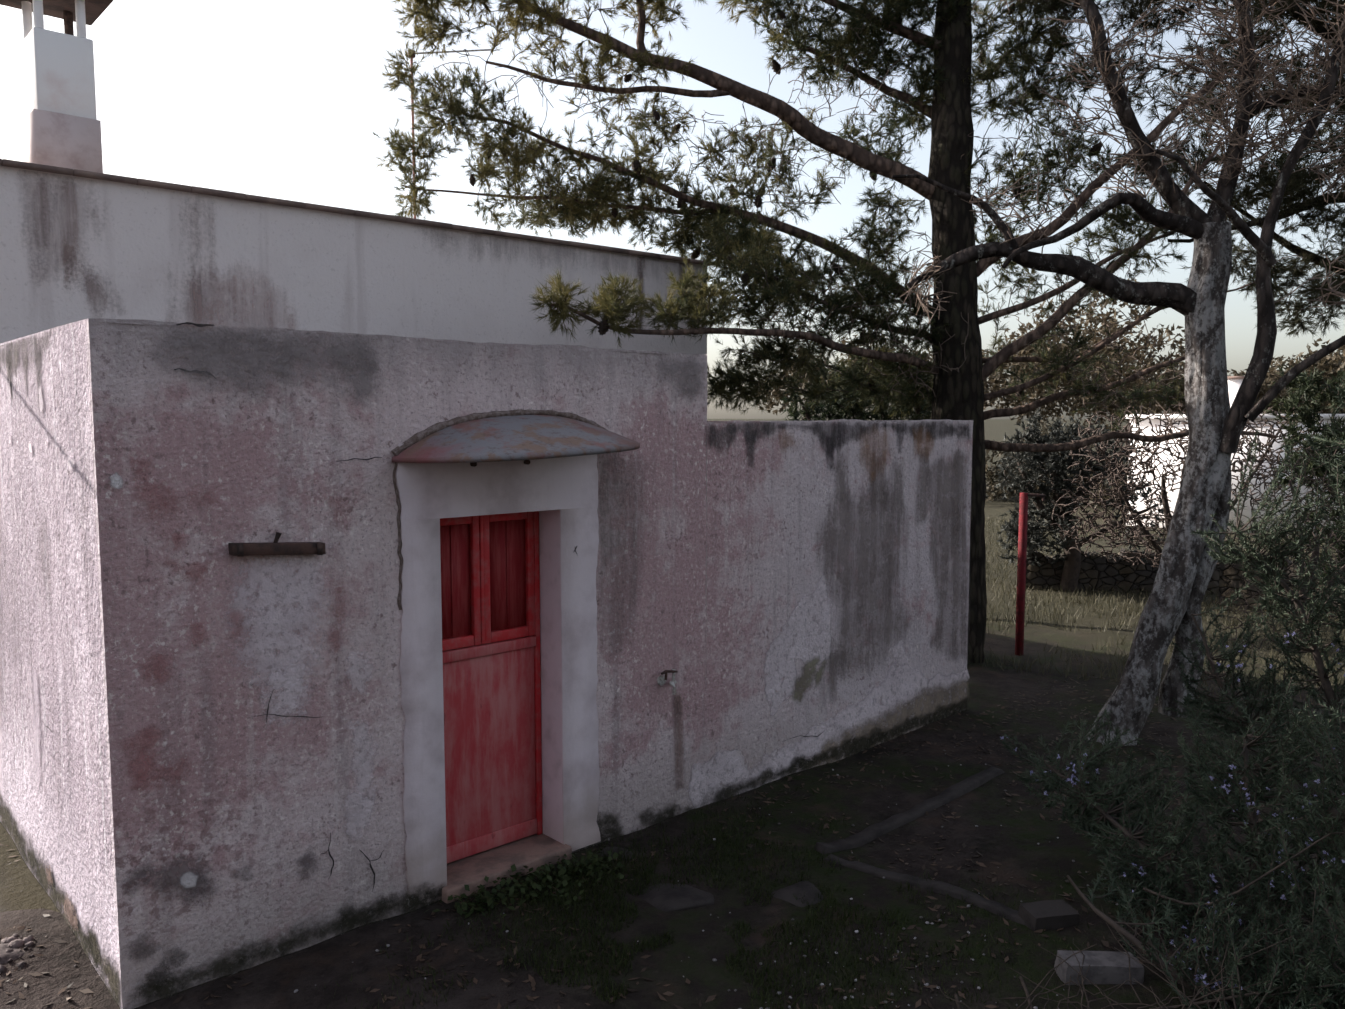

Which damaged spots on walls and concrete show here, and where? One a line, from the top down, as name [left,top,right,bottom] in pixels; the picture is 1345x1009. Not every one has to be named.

leakage [1,336,47,393]
leakage [709,422,786,463]
leakage [794,422,969,701]
leakage [0,795,121,1007]
leakage [138,886,444,1005]